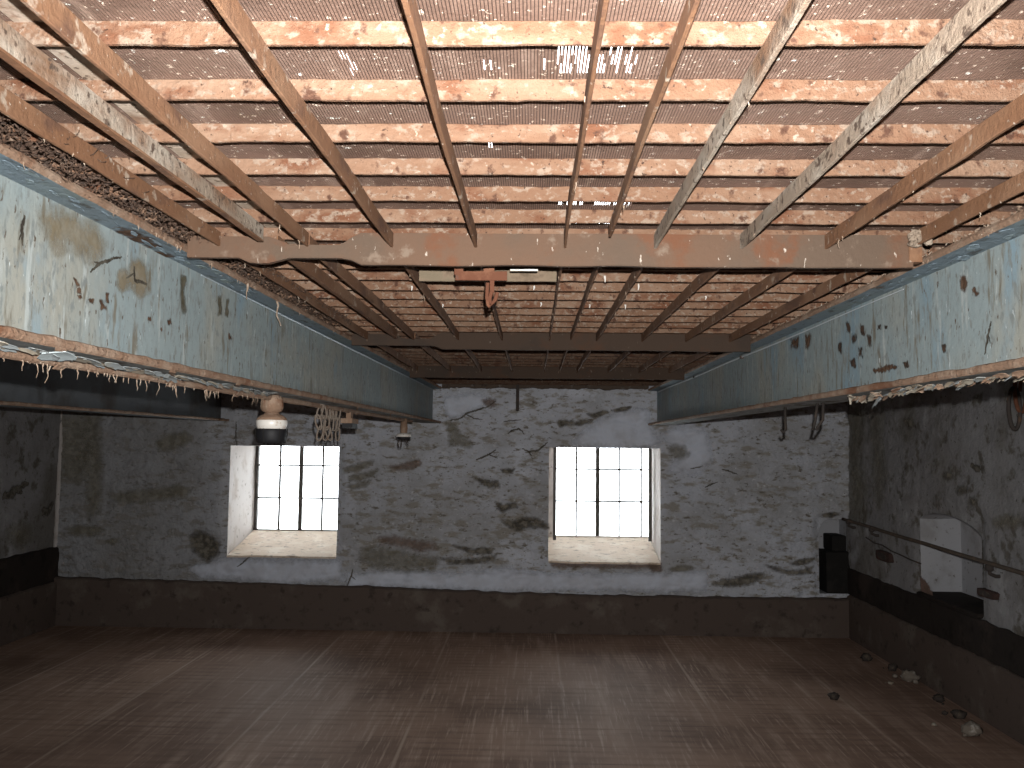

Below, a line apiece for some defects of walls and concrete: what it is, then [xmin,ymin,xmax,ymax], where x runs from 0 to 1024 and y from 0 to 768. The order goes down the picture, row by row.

corrosion [46,212,102,262]
corrosion [73,260,148,310]
corrosion [960,276,979,296]
corrosion [218,296,229,317]
corrosion [791,334,811,349]
corrosion [838,323,888,368]
peeling [0,341,278,396]
corrosion [873,360,909,374]
peeling [847,370,1024,408]
damp [361,548,437,570]